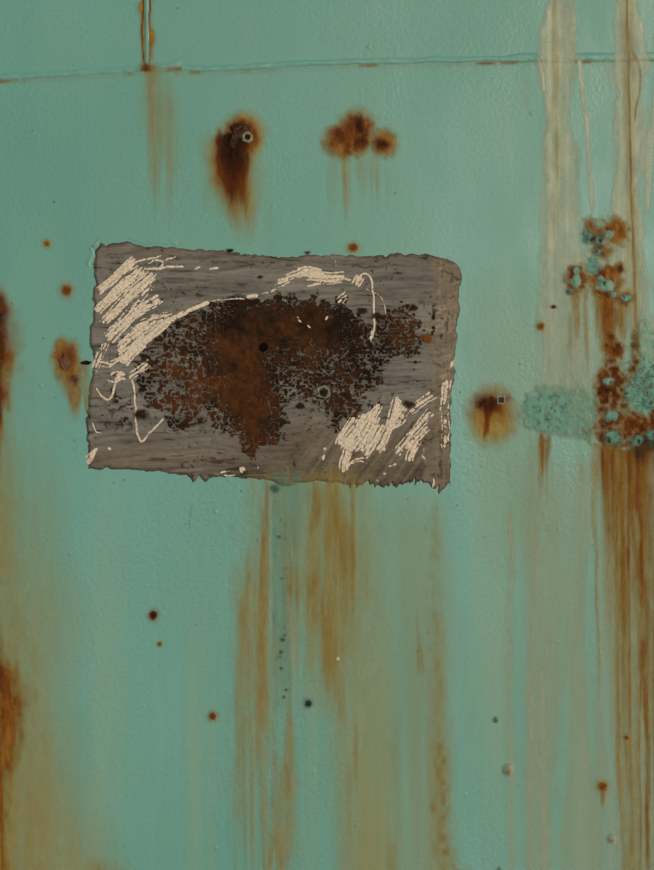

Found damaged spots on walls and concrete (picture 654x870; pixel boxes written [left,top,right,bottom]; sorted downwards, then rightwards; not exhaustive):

rust [213,114,263,209]
rust [323,112,396,183]
damp [538,0,606,405]
damp [599,0,654,341]
rust [564,216,635,356]
rust [0,293,13,432]
rust [52,339,86,410]
rust [111,292,443,460]
rust [470,391,512,440]
rust [600,442,654,859]
rust [0,658,23,870]